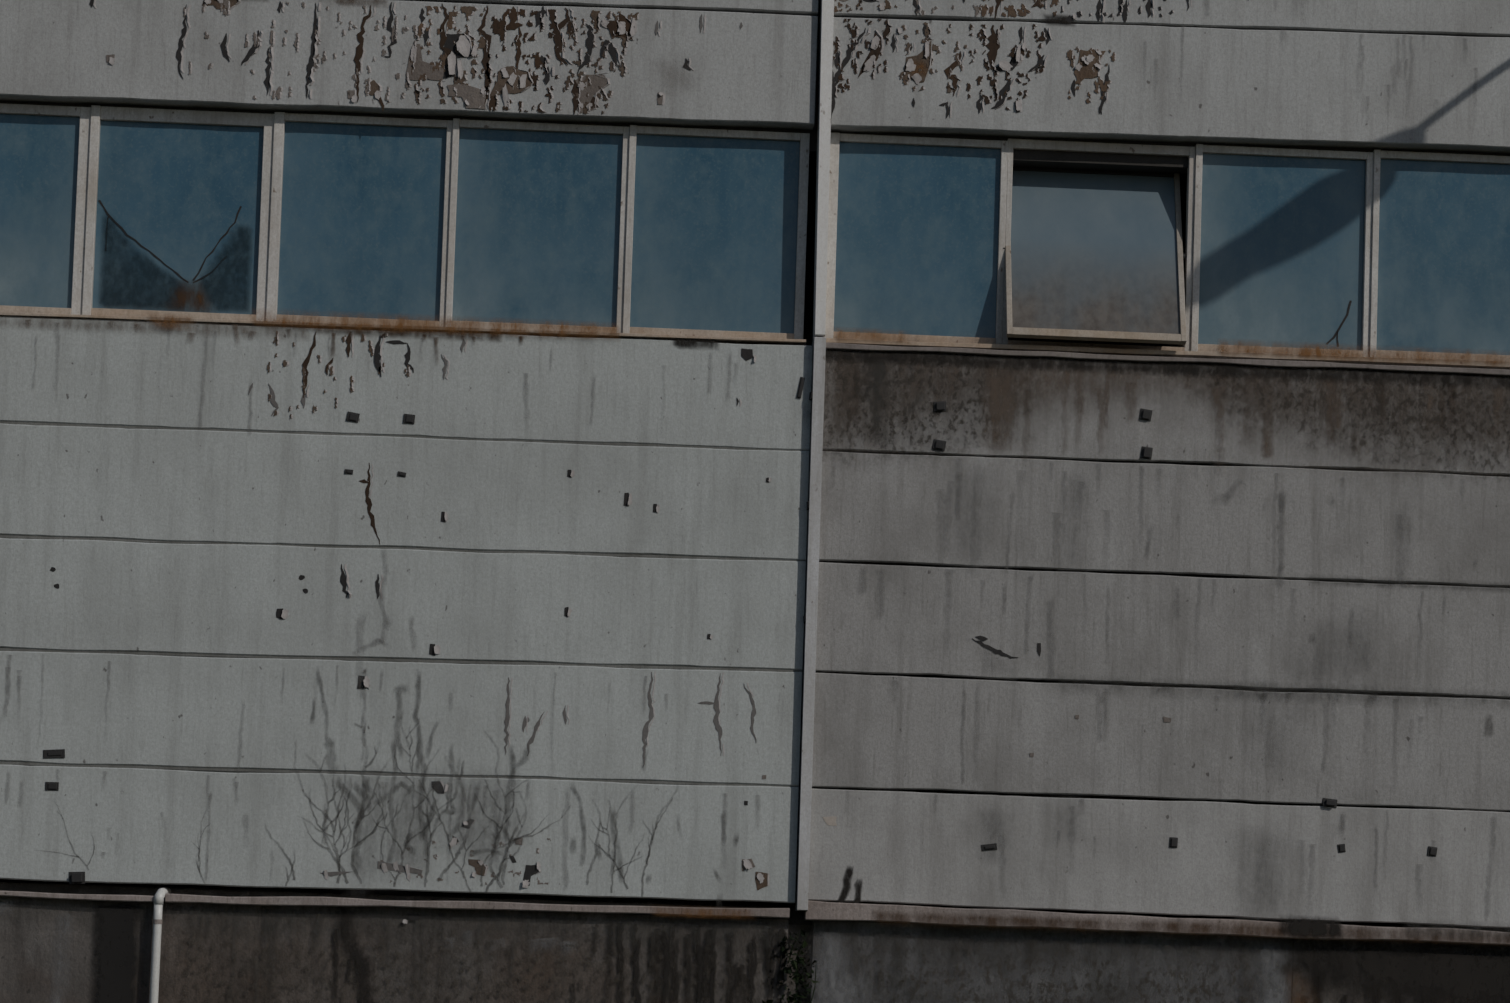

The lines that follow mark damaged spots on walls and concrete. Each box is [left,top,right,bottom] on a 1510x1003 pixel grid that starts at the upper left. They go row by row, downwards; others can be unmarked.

peeling [183,0,241,16]
peeling [245,5,640,114]
peeling [833,0,1174,113]
peeling [267,331,355,419]
peeling [342,334,386,374]
water stain [826,349,1510,467]